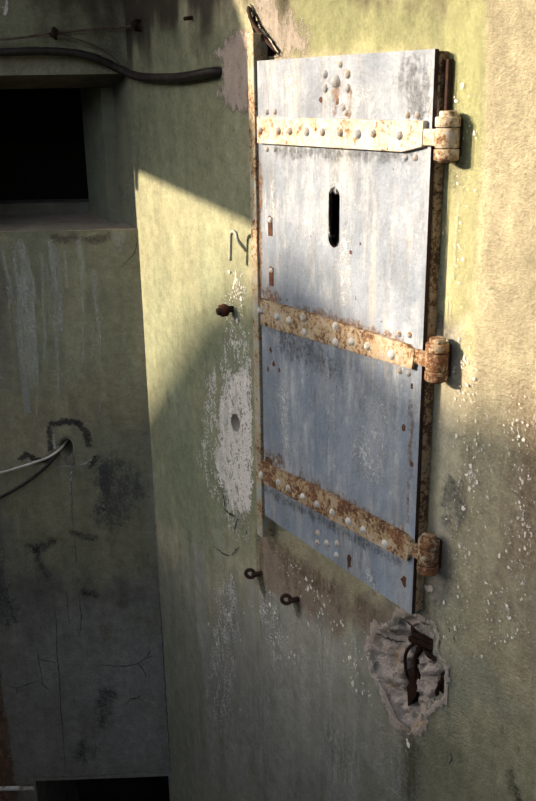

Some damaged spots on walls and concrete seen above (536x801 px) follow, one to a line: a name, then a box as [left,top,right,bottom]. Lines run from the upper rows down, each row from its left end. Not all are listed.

peeling [214,0,310,113]
peeling [197,270,254,541]
peeling [445,342,536,645]
rust [0,686,15,801]
crack [7,591,100,764]
crack [97,593,171,770]
spalling [330,607,466,741]